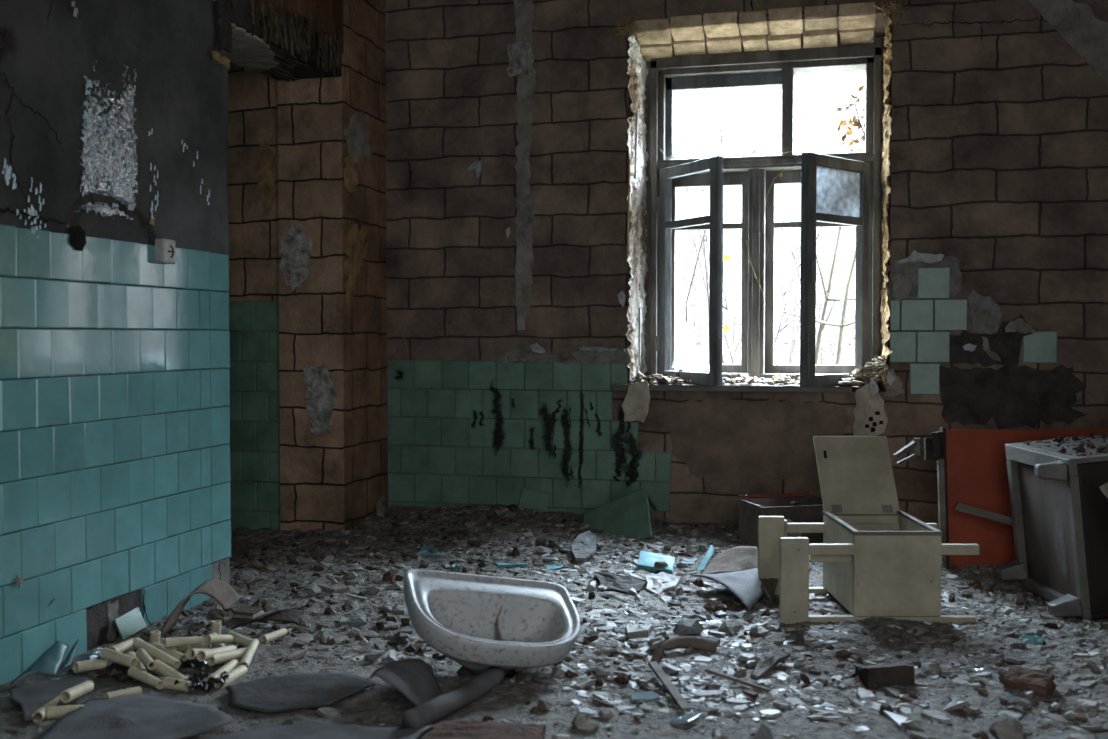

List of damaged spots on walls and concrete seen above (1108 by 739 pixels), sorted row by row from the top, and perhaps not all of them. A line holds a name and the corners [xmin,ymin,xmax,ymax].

peeling [67,61,138,251]
water stain [471,384,515,455]
water stain [529,391,642,487]